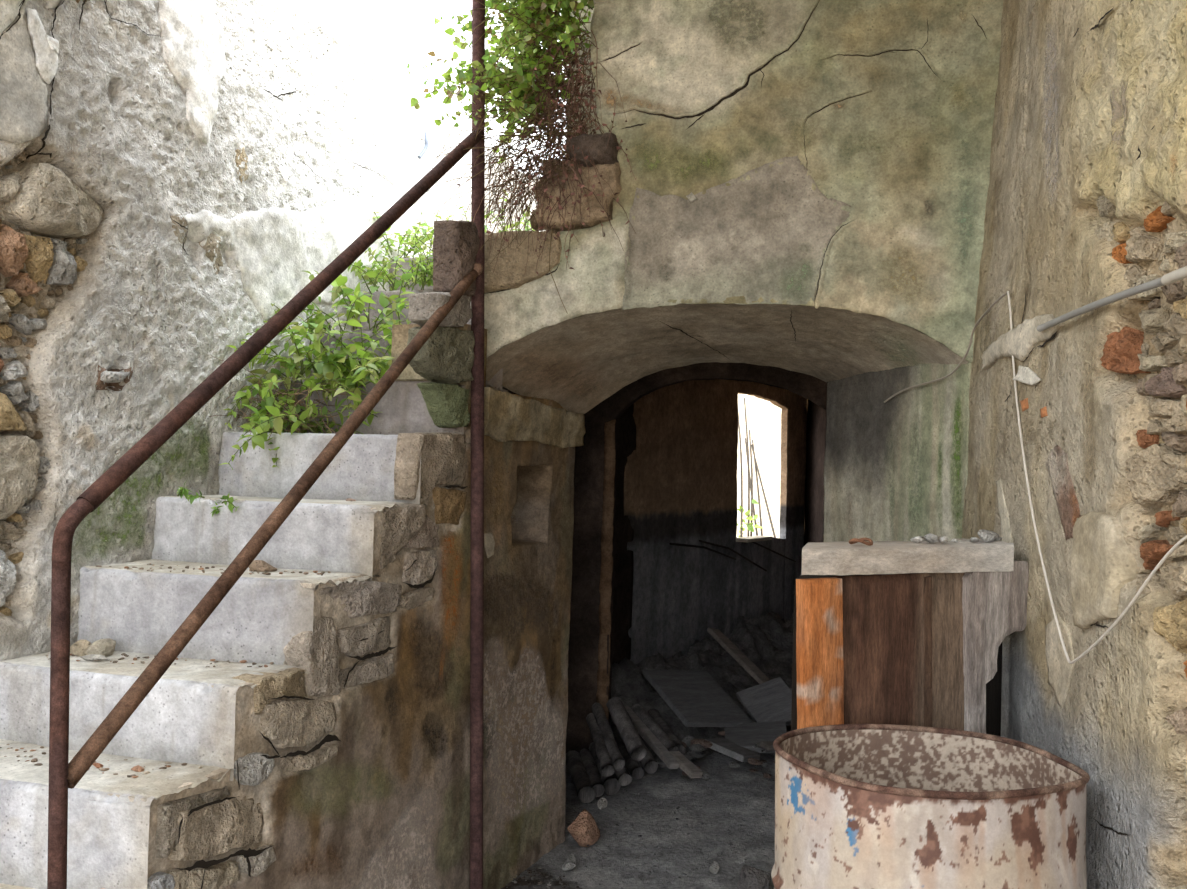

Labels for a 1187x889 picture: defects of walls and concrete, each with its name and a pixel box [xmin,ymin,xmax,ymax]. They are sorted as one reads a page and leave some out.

crack [18,68,58,170]
crack [0,0,165,41]
crack [598,0,819,130]
crack [800,88,872,160]
crack [820,20,944,80]
peeling [622,156,851,310]
crack [790,218,859,342]
spalling [0,150,104,616]
spalling [1094,196,1187,677]